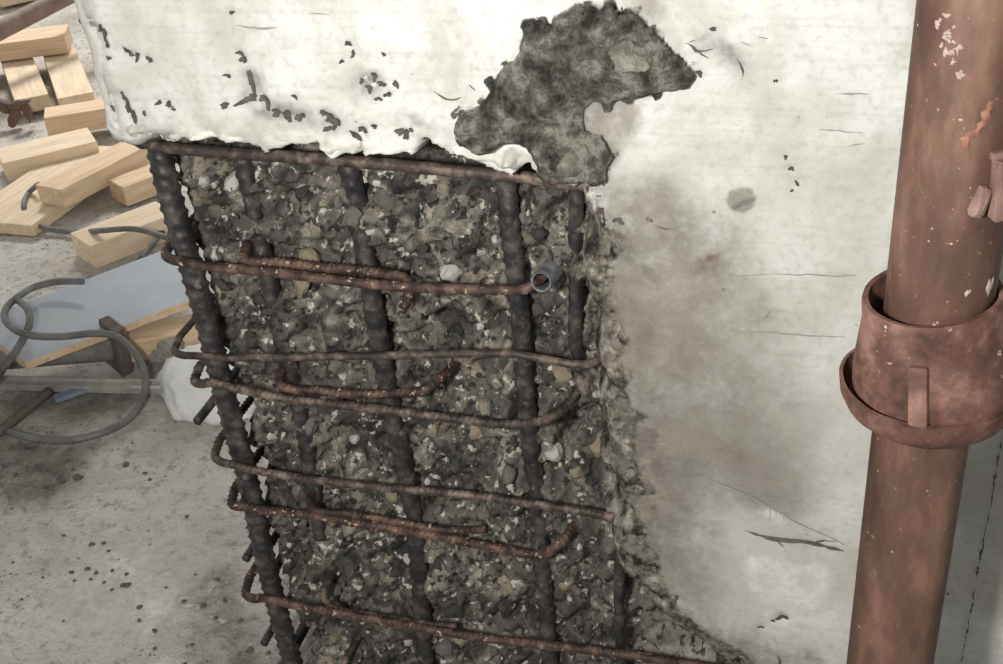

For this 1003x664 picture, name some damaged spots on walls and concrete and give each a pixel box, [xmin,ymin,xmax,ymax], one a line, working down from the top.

peeling [603,0,634,15]
spalling [220,51,305,123]
spalling [359,72,399,101]
peeling [477,76,495,105]
leakage [583,102,635,154]
spalling [115,110,752,664]
crack [698,474,844,552]
crack [961,428,1003,662]